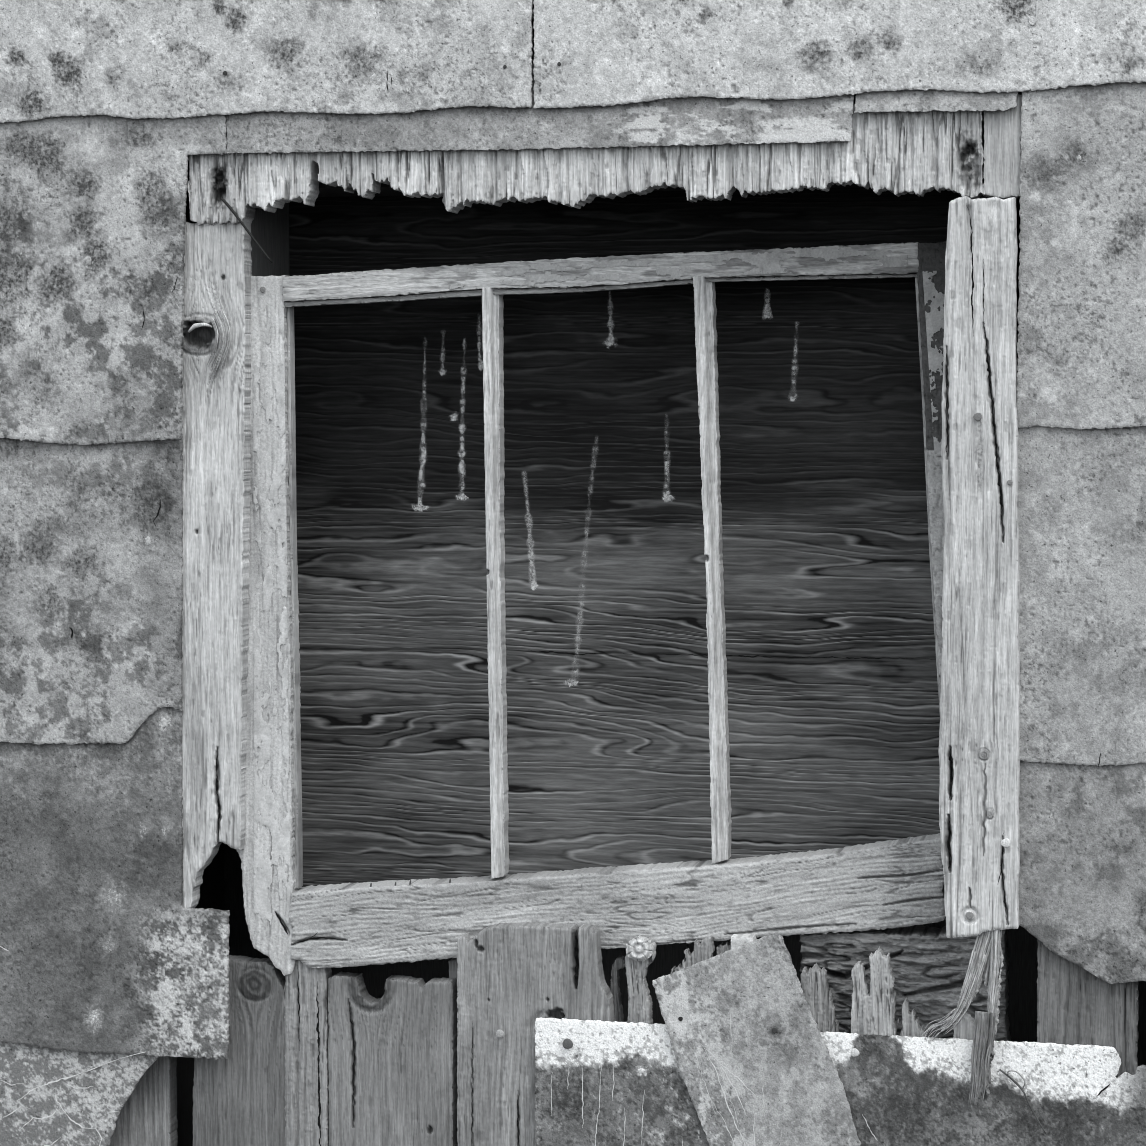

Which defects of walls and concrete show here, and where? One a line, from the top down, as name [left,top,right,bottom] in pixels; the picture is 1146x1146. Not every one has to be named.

damp [213,0,246,31]
damp [1001,0,1032,22]
damp [21,91,47,117]
damp [50,52,82,85]
damp [4,131,65,178]
damp [0,170,110,302]
damp [414,423,429,511]
damp [451,369,468,500]
damp [605,292,615,348]
peeling [923,271,945,423]
crack [943,348,951,457]
crack [967,207,1003,542]